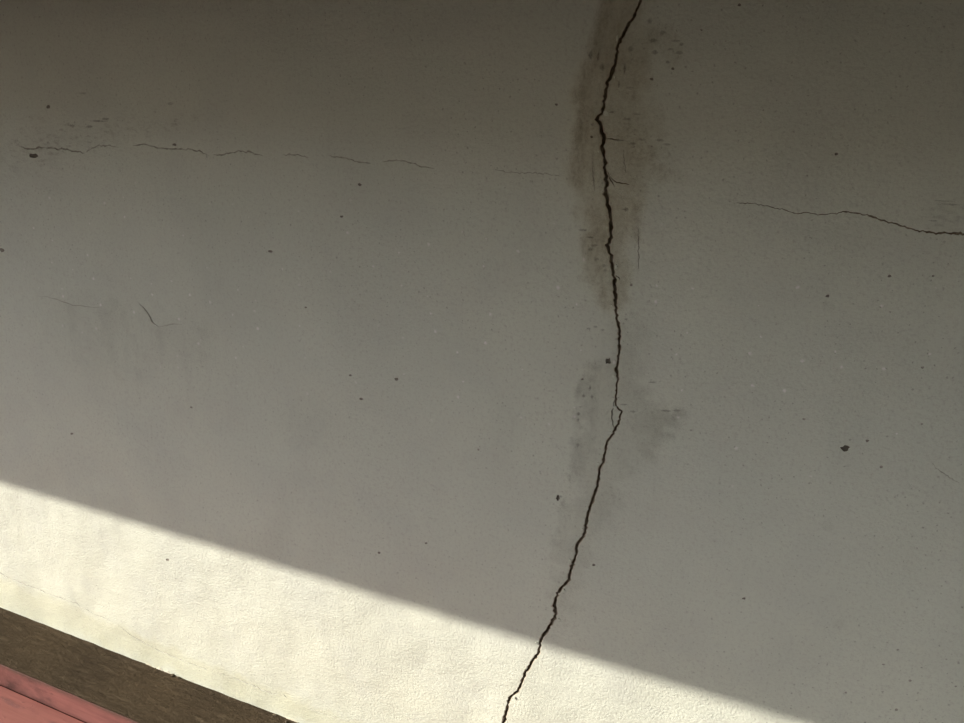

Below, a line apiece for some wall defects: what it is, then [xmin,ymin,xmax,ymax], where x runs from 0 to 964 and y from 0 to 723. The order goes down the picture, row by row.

crack [21,143,260,156]
crack [740,203,964,236]
crack [501,0,645,723]
crack [1,573,287,698]